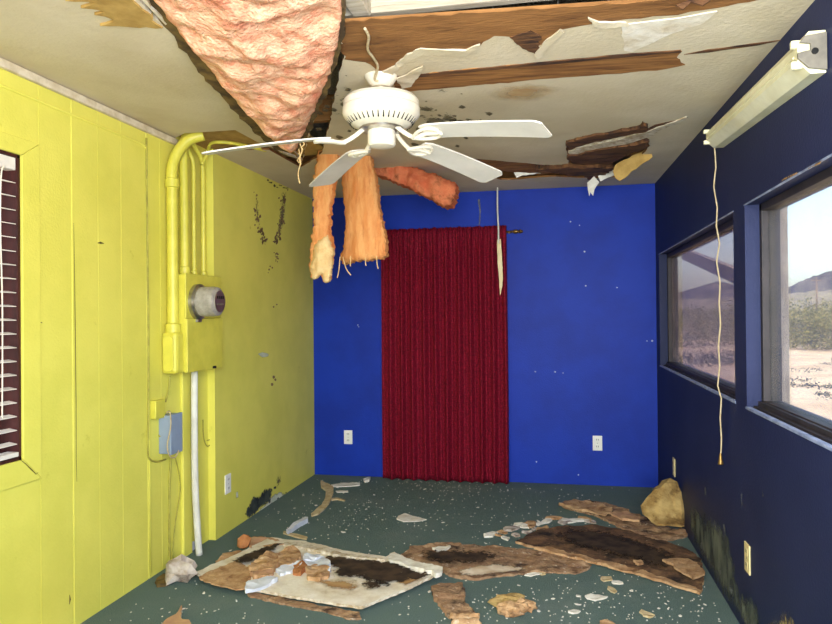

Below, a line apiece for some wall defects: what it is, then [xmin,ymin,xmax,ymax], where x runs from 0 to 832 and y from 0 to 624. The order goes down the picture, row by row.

peeling [341,0,756,92]
leakage [690,511,759,624]